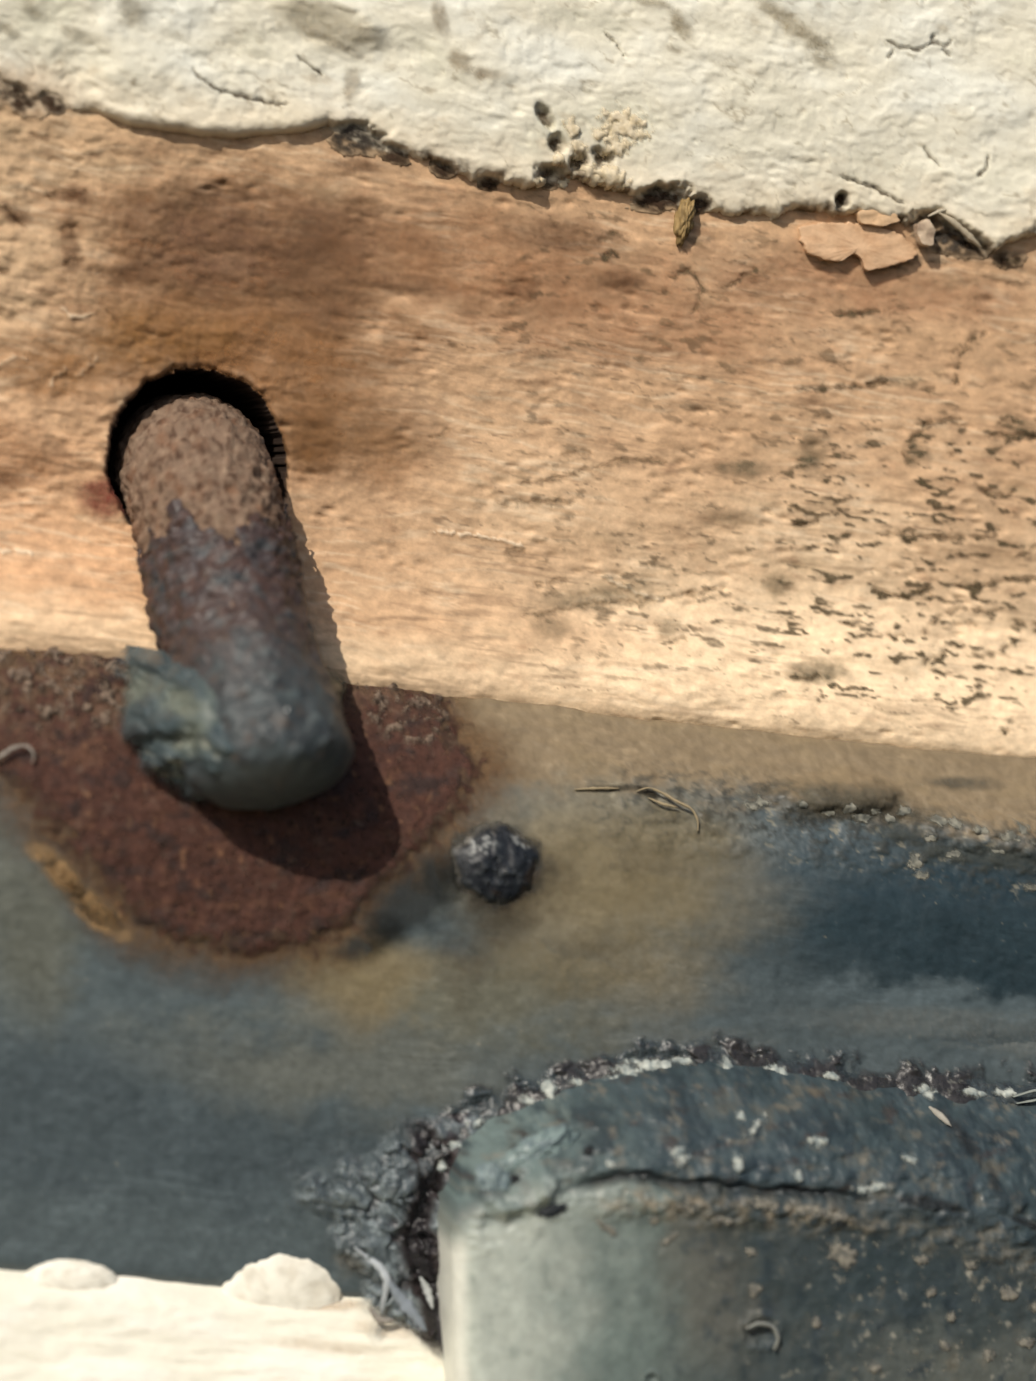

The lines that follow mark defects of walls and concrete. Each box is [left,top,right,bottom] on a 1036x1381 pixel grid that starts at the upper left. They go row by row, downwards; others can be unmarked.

crack [888,37,949,58]
spalling [1,85,64,113]
spalling [332,124,406,162]
peeling [535,107,710,213]
peeling [798,194,982,271]
rust [110,194,399,475]
rust [86,481,120,514]
rust [0,646,506,968]
water stain [34,845,119,931]
peeling [520,1079,557,1104]
peeling [437,1141,462,1171]
peeling [354,1246,434,1332]